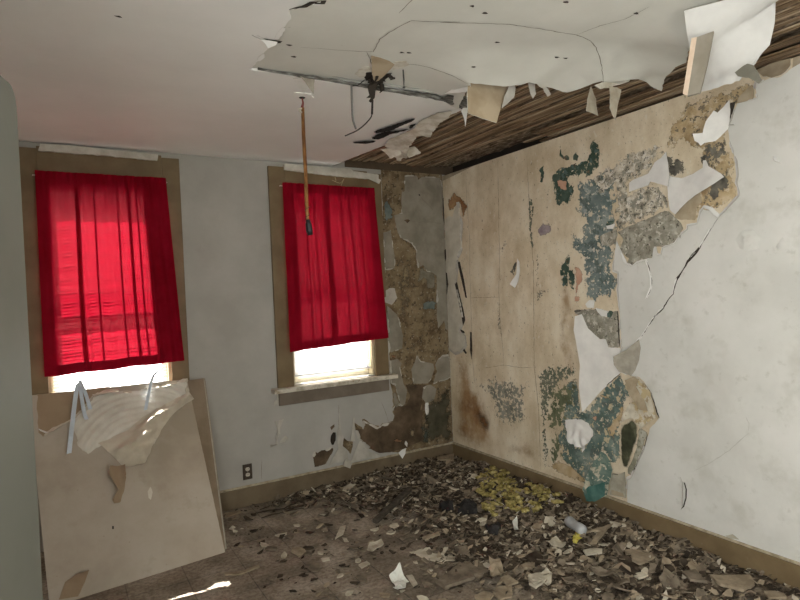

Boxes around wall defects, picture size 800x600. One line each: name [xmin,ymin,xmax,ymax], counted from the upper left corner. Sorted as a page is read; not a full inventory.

spalling [289,0,326,10]
spalling [252,27,471,109]
peeling [312,58,793,502]
crack [636,220,717,341]
water stain [356,355,538,467]